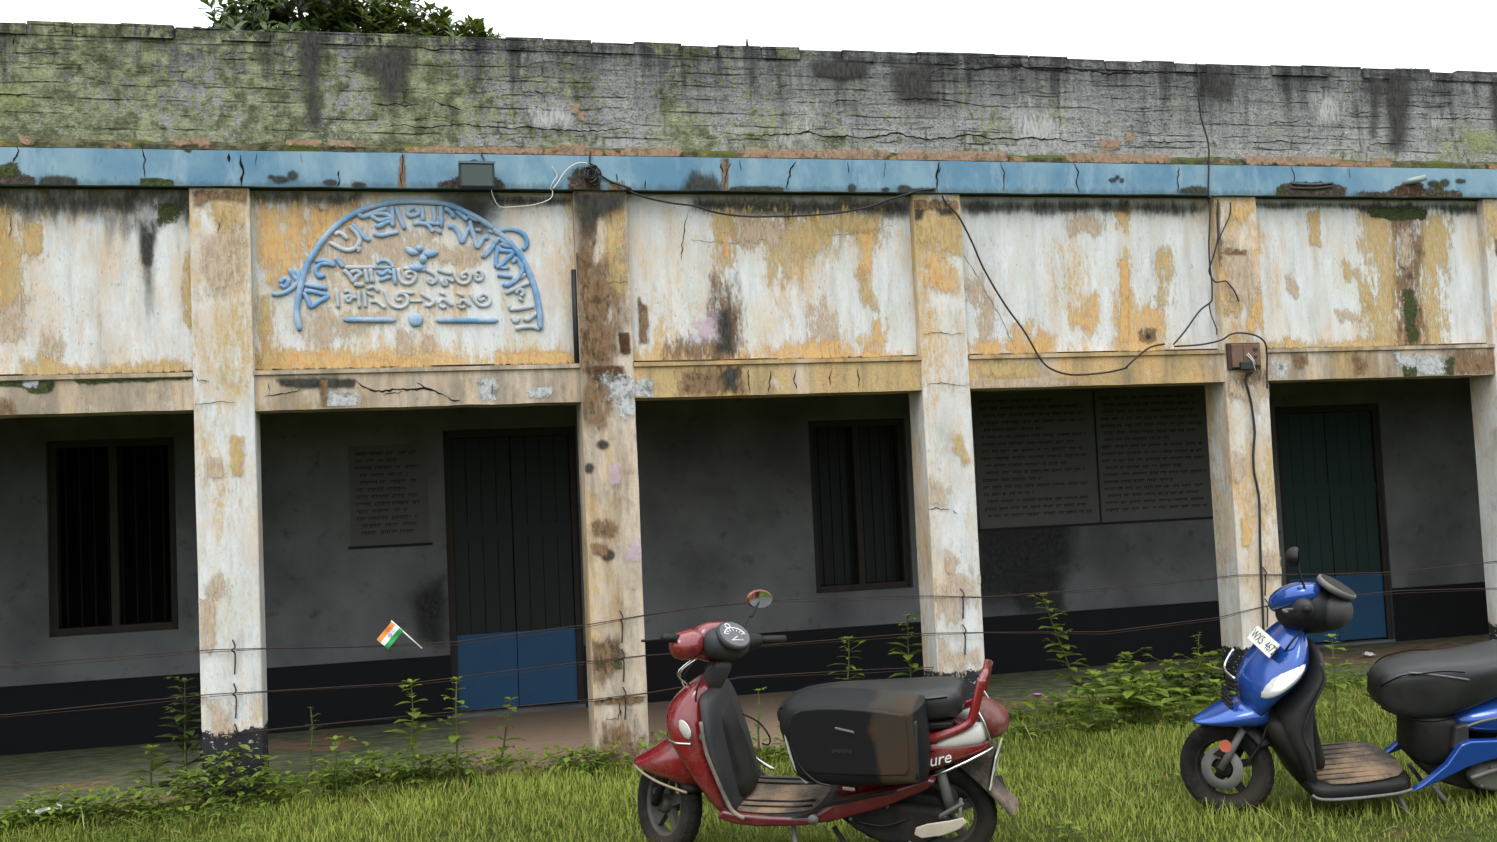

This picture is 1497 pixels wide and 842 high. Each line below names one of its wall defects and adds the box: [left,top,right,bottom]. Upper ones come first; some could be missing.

spalling [0,162,77,185]
damp [0,189,189,284]
peeling [0,205,193,388]
damp [298,30,322,125]
peeling [181,189,486,370]
damp [1018,116,1059,148]
peeling [914,200,1177,355]
flaking render [1245,156,1463,247]
damp [1256,179,1495,376]
damp [1370,75,1408,148]
crack [196,377,300,405]
crack [357,381,493,401]